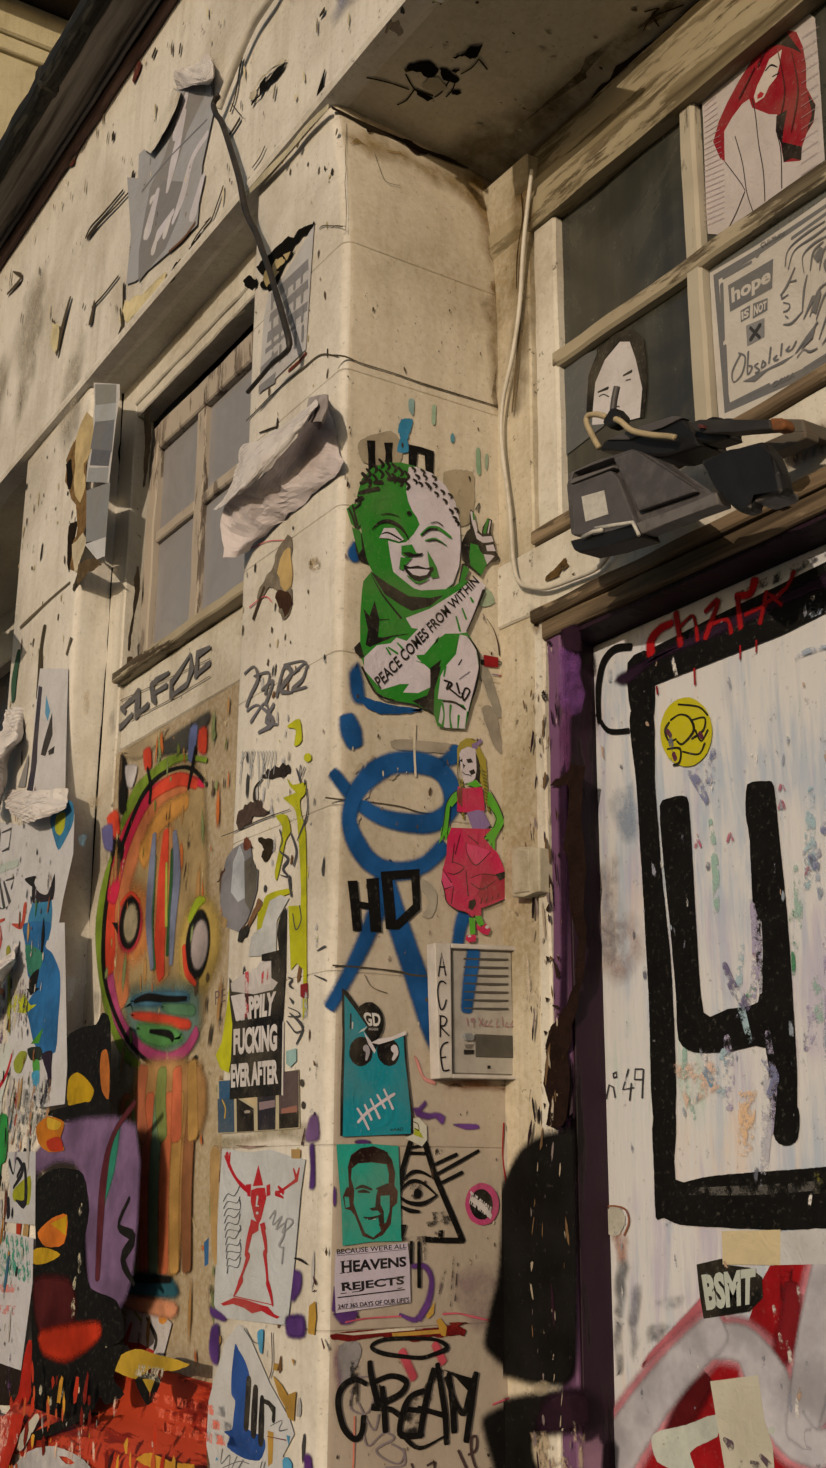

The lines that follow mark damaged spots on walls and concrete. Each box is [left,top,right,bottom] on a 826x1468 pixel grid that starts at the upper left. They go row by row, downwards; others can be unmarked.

peeling [367,41,488,105]